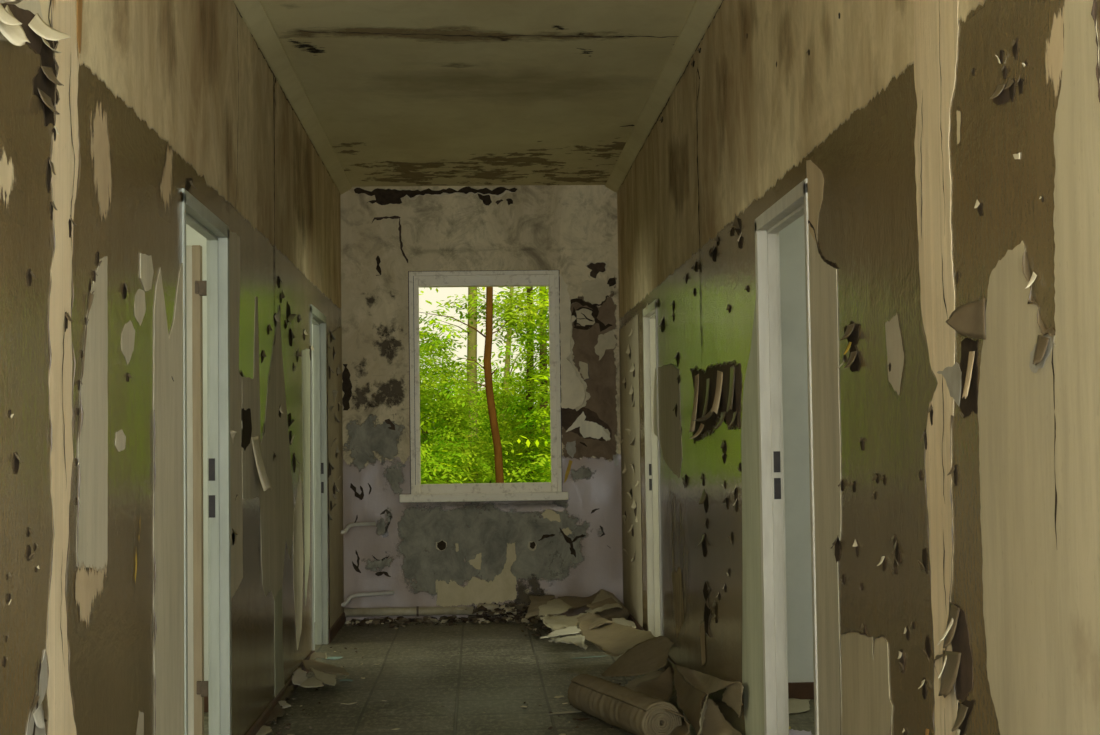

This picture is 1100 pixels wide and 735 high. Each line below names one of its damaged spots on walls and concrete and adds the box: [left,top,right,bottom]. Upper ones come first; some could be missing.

peeling [0,0,112,735]
peeling [121,253,154,382]
peeling [229,231,276,599]
flaking render [327,325,405,628]
water stain [333,27,517,41]
flaking render [364,500,590,617]
flaking render [332,138,626,206]
flaking render [562,261,675,628]
peeling [672,285,765,735]
peeling [835,321,861,372]
peeling [913,0,986,735]
peeling [1045,2,1065,102]